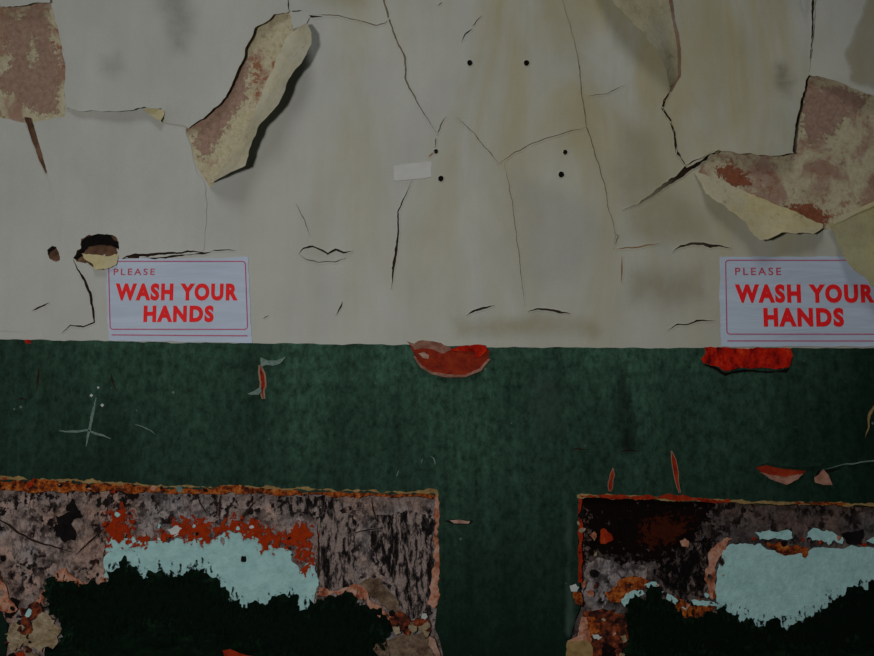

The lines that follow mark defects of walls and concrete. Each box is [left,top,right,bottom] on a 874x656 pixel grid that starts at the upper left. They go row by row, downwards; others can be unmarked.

crack [808,0,816,58]
peeling [0,0,312,343]
crack [286,0,732,317]
peeling [613,0,874,287]
crack [120,248,236,260]
crack [32,301,50,312]
crack [61,259,97,334]
peeling [407,340,491,378]
crack [667,318,715,332]
peeling [701,347,793,376]
spalling [0,475,472,656]
spalling [566,493,874,656]